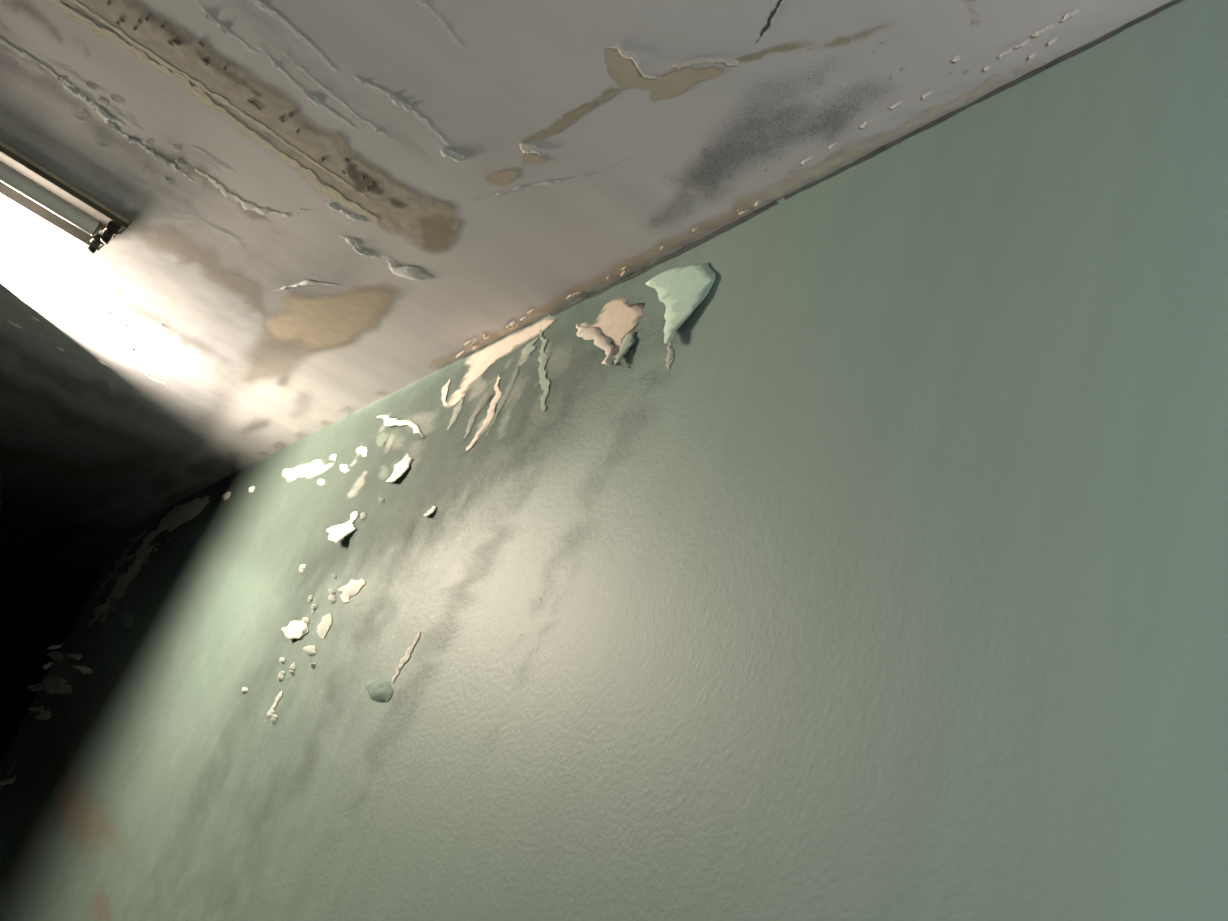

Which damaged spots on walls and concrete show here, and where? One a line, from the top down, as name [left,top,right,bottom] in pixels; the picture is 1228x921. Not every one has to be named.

leakage [640,23,903,238]
flaking render [282,9,1079,543]
peeling [264,574,365,724]